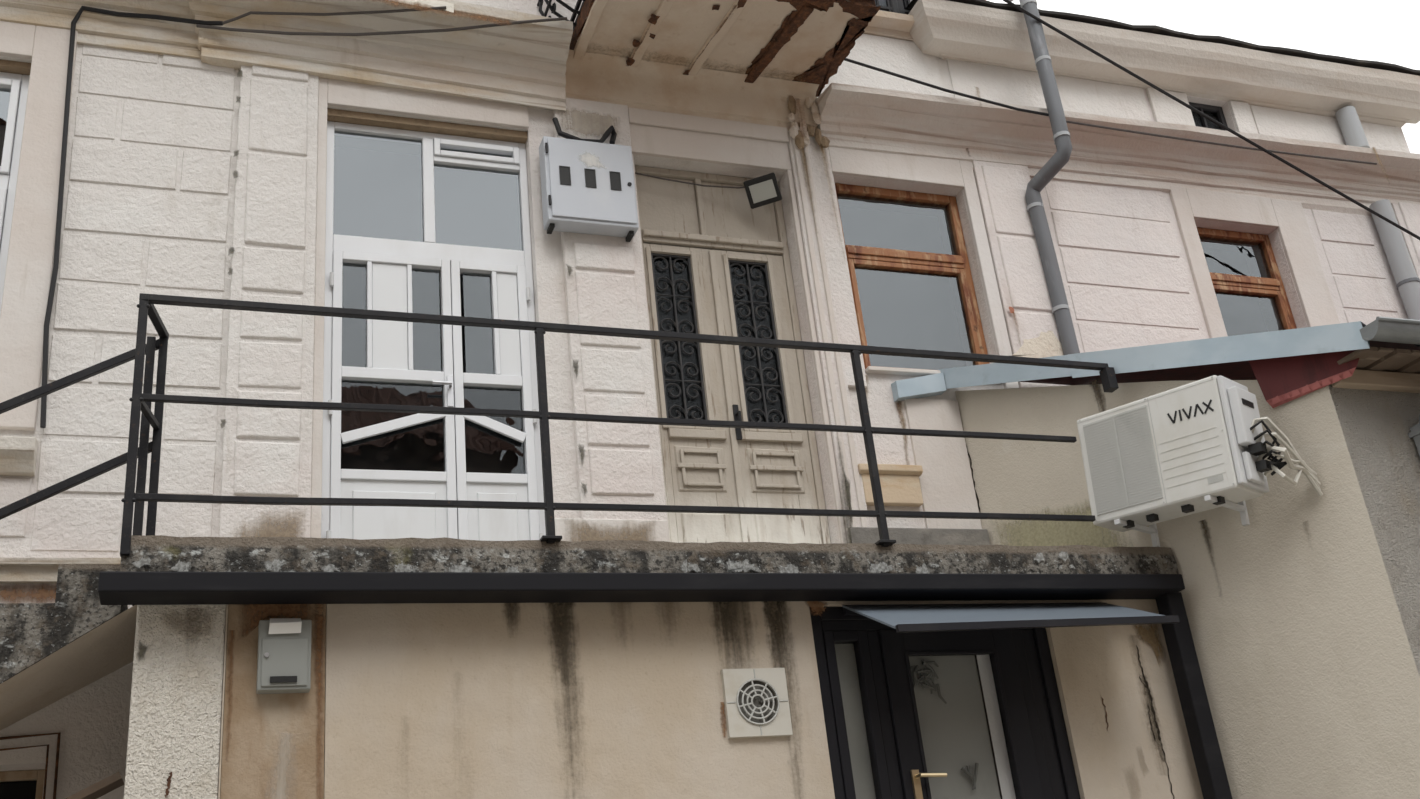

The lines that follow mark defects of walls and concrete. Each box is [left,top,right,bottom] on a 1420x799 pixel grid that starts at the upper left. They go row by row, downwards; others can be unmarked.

spalling [745,0,881,190]
water stain [548,603,576,707]
water stain [716,601,791,697]
crack [1136,645,1174,799]